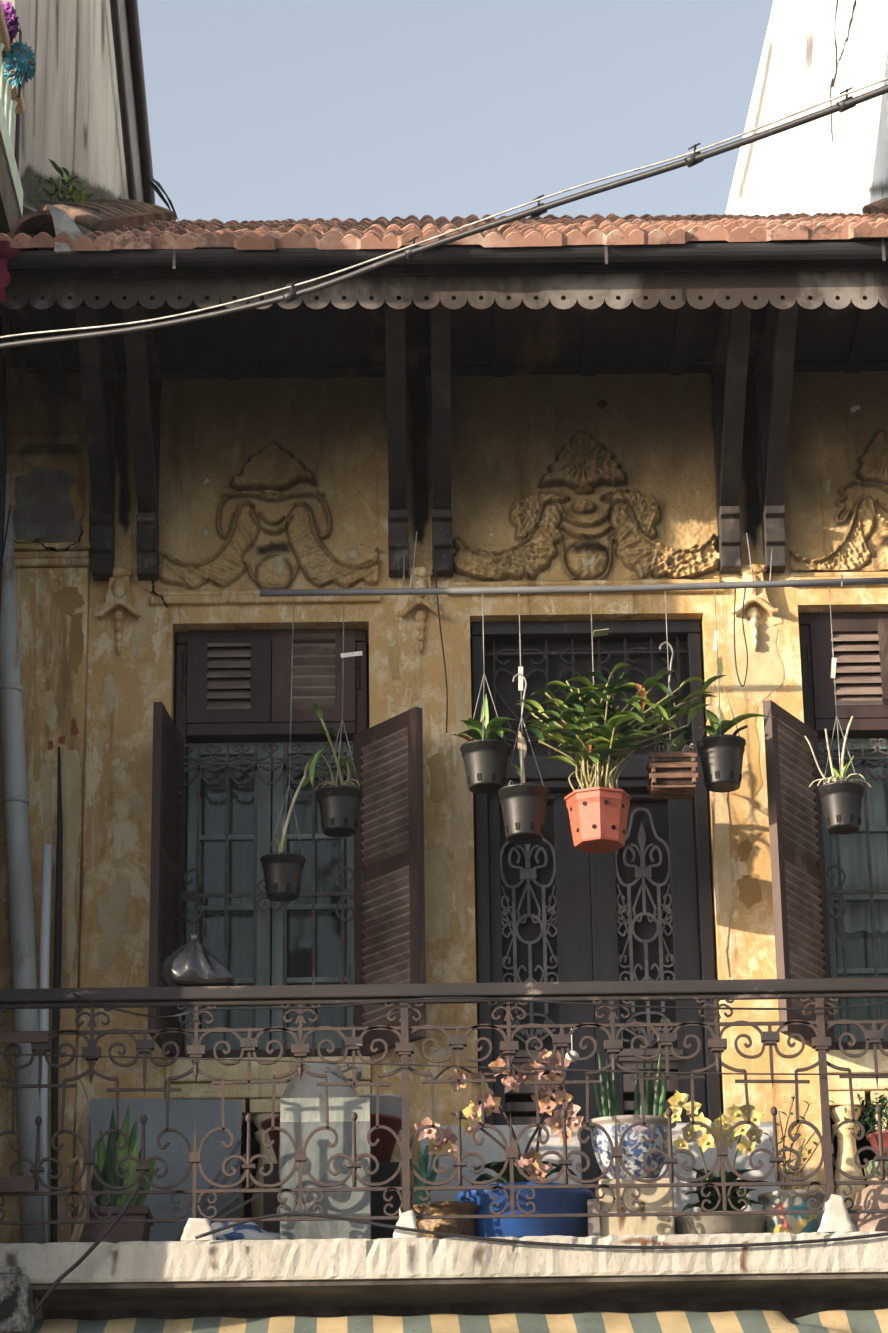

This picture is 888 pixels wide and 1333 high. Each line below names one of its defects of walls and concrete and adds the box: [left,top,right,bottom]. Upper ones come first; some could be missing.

spalling [13,444,84,545]
peeling [725,607,784,797]
peeling [714,792,761,977]
corrosion [621,1238,671,1250]